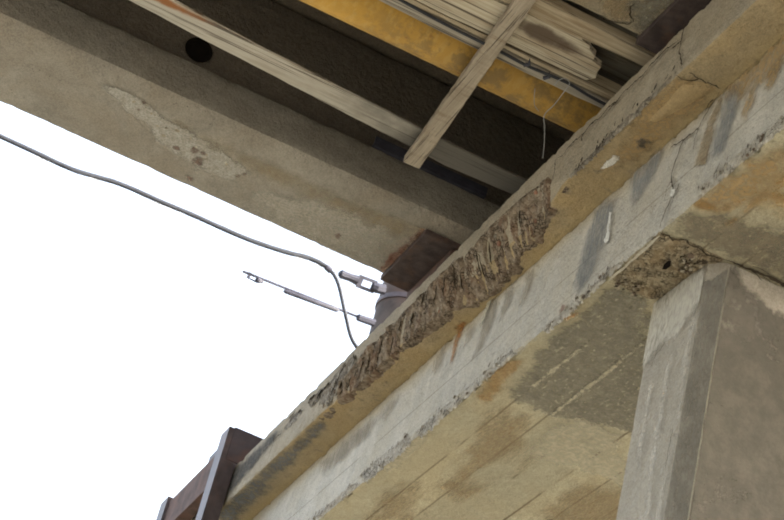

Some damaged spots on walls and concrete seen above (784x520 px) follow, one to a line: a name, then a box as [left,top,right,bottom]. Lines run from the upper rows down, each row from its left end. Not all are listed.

peeling [104,86,250,181]
leakage [602,80,705,196]
crack [553,26,784,287]
spalling [284,410,302,430]
spalling [308,177,558,420]
leakage [442,150,784,520]